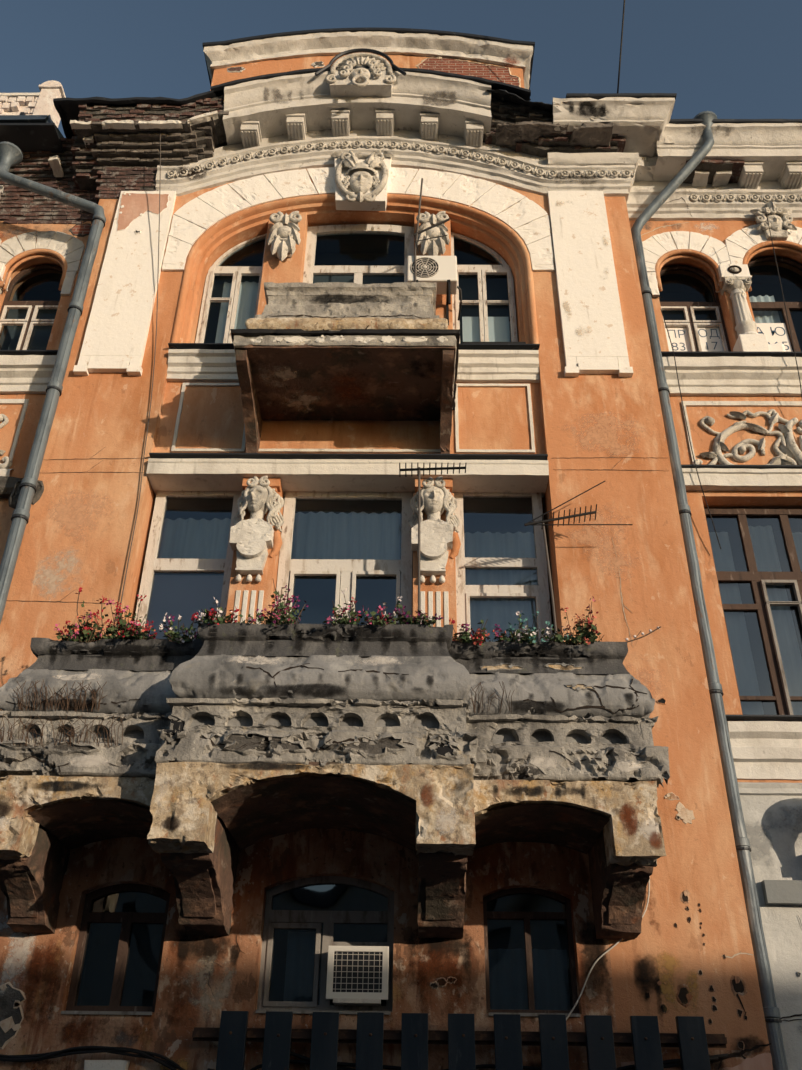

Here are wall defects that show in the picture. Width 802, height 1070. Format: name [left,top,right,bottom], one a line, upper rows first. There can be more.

peeling [117,193,169,235]
flaking render [0,739,100,756]
flaking render [160,713,190,745]
flaking render [221,730,307,757]
flaking render [331,733,406,760]
flaking render [425,738,463,760]
peeling [664,792,695,824]
leakage [0,917,34,992]
leakage [173,931,239,977]
leakage [412,930,471,974]
leakage [635,953,676,1010]
flaking render [0,981,26,1050]